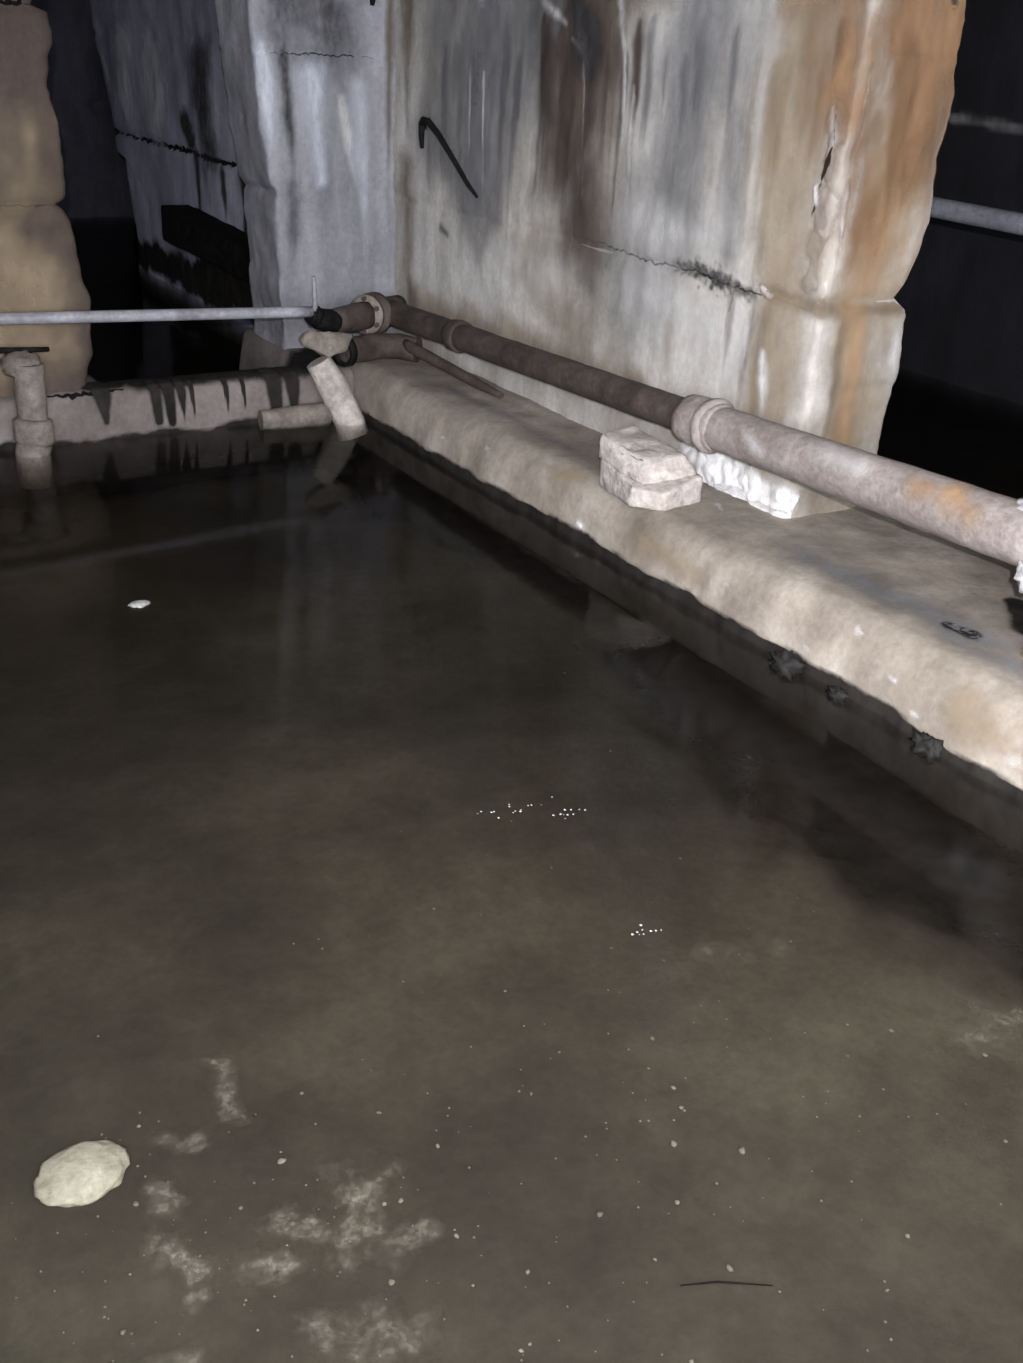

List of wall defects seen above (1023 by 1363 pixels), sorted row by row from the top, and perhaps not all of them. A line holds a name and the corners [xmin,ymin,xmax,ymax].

damp [255,42,293,145]
damp [305,65,325,184]
damp [428,0,531,229]
crack [586,239,773,311]
damp [658,0,731,251]
crack [812,114,837,214]
corrosion [821,0,966,443]